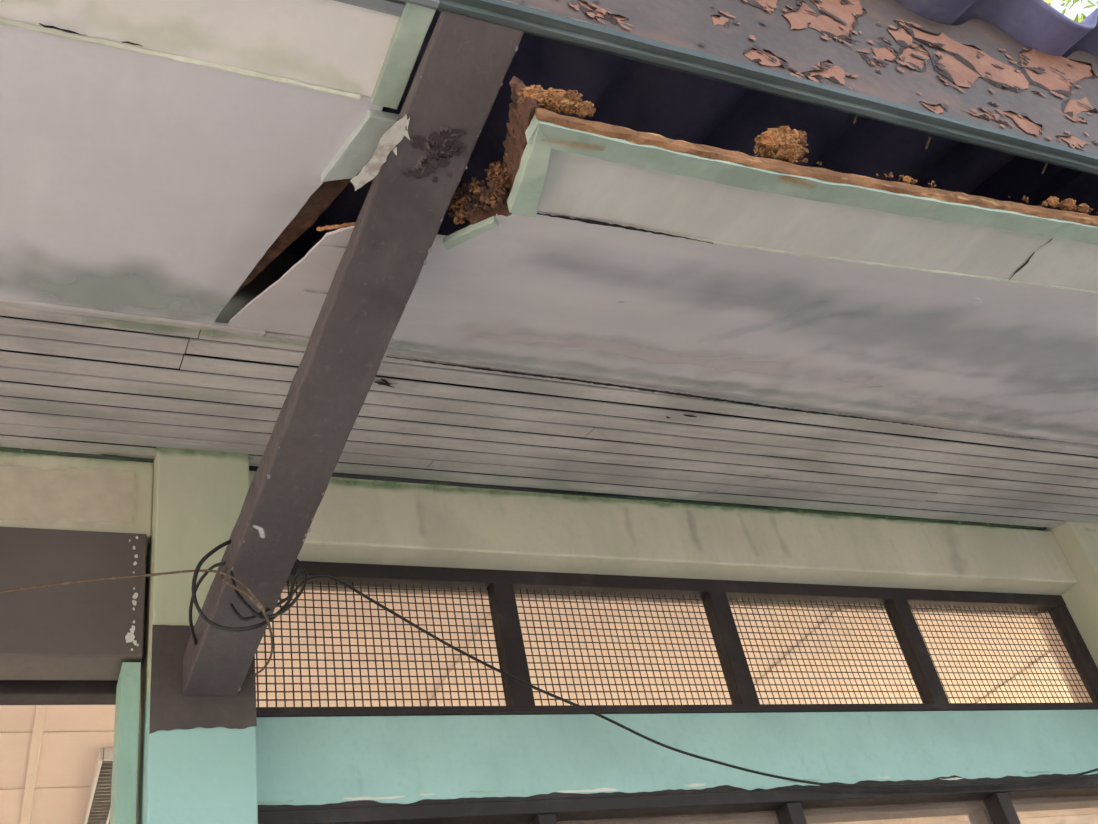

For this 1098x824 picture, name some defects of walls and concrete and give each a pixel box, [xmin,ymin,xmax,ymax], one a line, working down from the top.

peeling [569,0,633,30]
peeling [712,5,740,28]
peeling [743,0,1098,150]
spalling [316,222,356,231]
crack [1009,239,1052,280]
peeling [125,587,139,651]